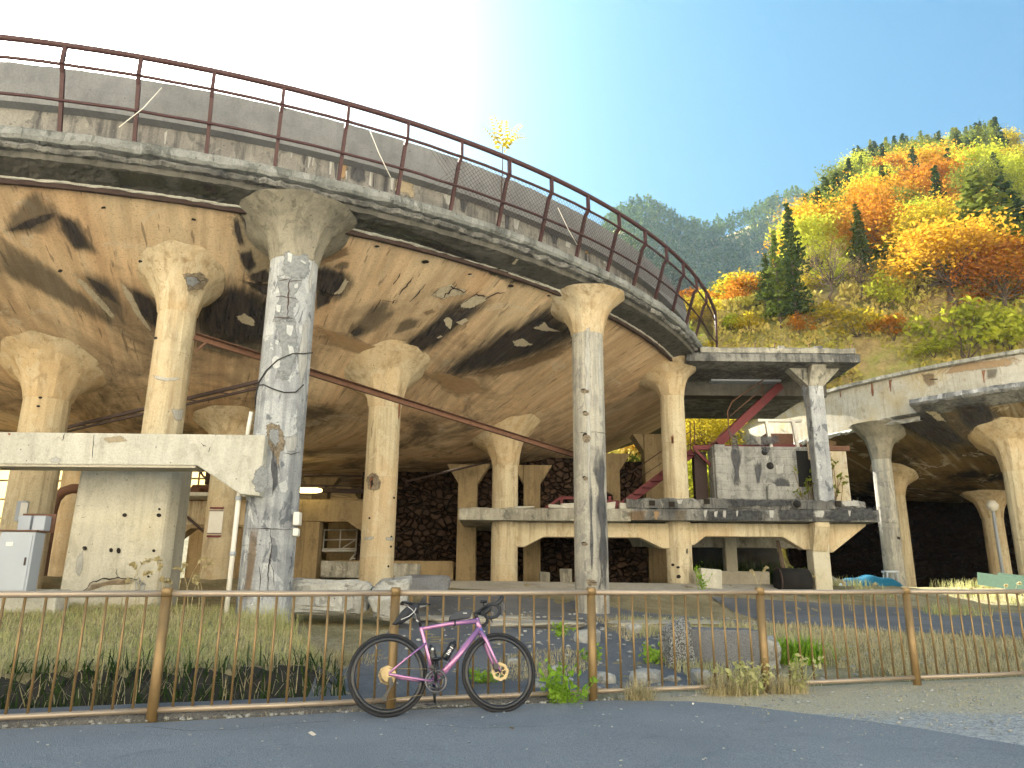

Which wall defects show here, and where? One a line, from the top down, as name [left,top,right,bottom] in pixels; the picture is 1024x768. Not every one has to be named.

water stain [8,194,94,251]
spalling [182,272,208,292]
water stain [195,282,268,357]
peeling [232,214,310,381]
water stain [406,301,486,351]
spalling [431,284,514,308]
water stain [446,308,572,376]
spalling [366,473,381,491]
water stain [730,433,790,486]
crack [83,571,145,591]